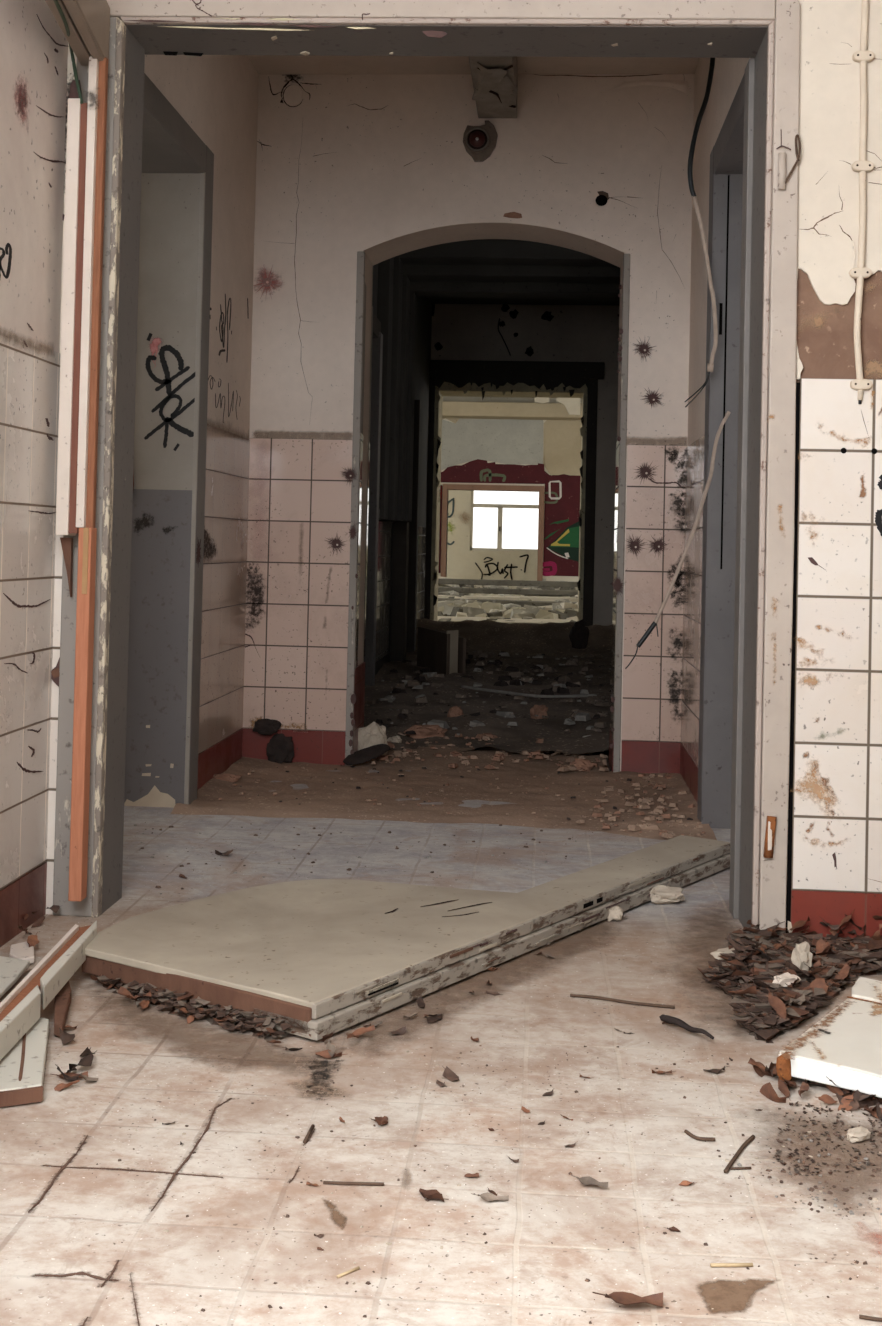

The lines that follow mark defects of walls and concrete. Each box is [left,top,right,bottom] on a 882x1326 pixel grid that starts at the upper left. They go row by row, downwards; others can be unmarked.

crack [257,74,328,425]
crack [801,150,882,240]
spalling [797,242,882,380]
peeling [124,764,175,808]
crack [28,1098,233,1213]
crack [33,1260,140,1326]